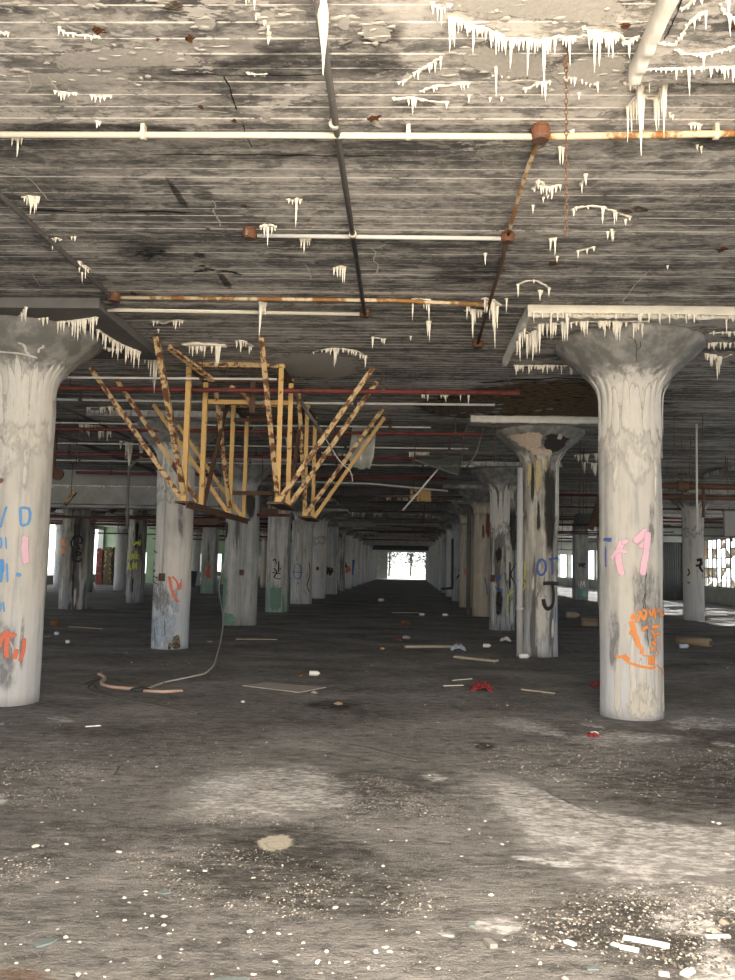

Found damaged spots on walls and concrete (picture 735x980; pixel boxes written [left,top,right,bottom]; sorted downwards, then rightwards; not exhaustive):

peeling [73,0,107,10]
spalling [145,0,184,11]
peeling [189,16,216,31]
peeling [0,43,230,87]
leakage [345,29,398,71]
peeling [435,0,644,93]
leakage [391,0,735,154]
spalling [415,396,525,419]
leakage [421,279,735,548]
peeling [507,432,552,456]
leakage [179,765,402,912]